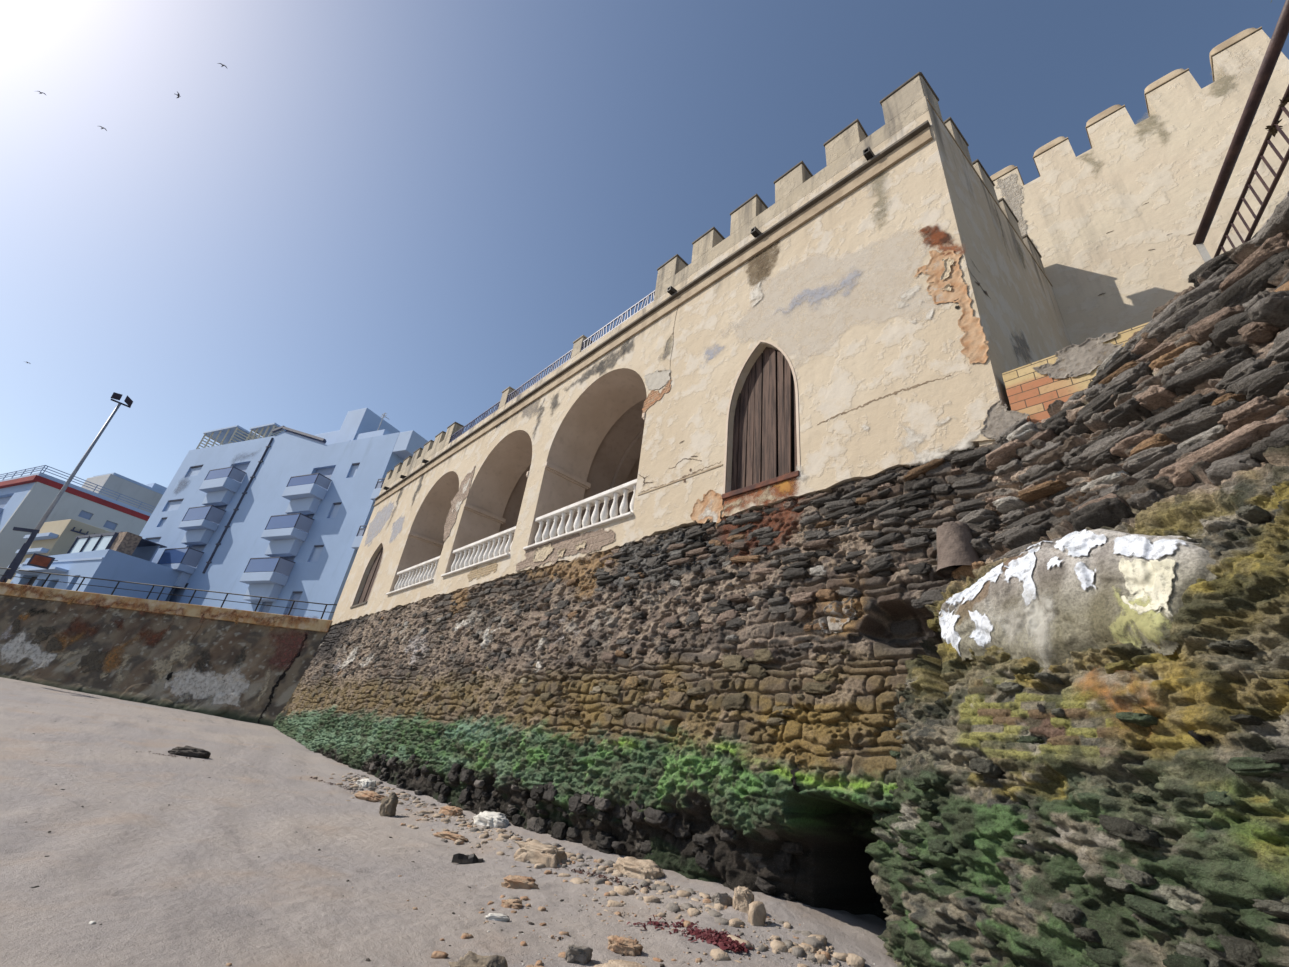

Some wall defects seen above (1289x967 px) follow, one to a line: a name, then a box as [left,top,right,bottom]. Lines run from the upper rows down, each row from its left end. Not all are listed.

water stain [746,242,779,285]
flaking render [914,250,989,364]
spalling [1033,331,1123,379]
flaking render [642,369,671,414]
crack [817,375,951,425]
flaking render [690,489,725,529]